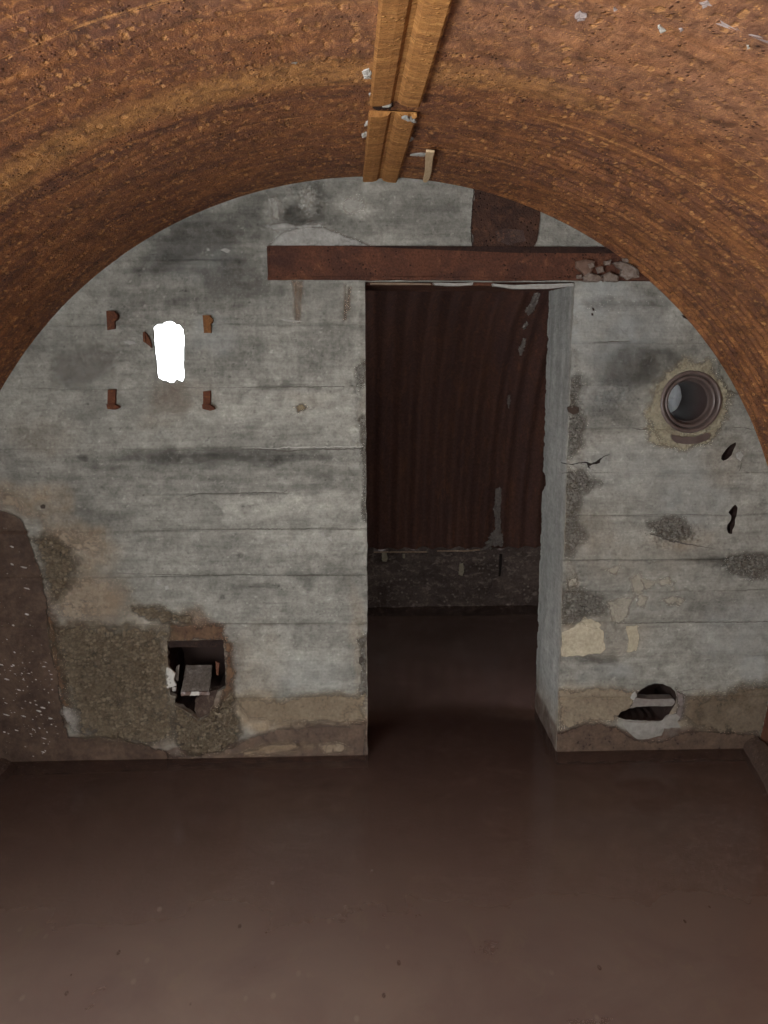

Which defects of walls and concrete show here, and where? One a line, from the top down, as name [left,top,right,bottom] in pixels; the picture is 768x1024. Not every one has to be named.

crack [561,454,610,473]
spalling [721,443,744,471]
spalling [727,505,737,533]
peeling [561,575,671,657]
spalling [33,535,242,757]